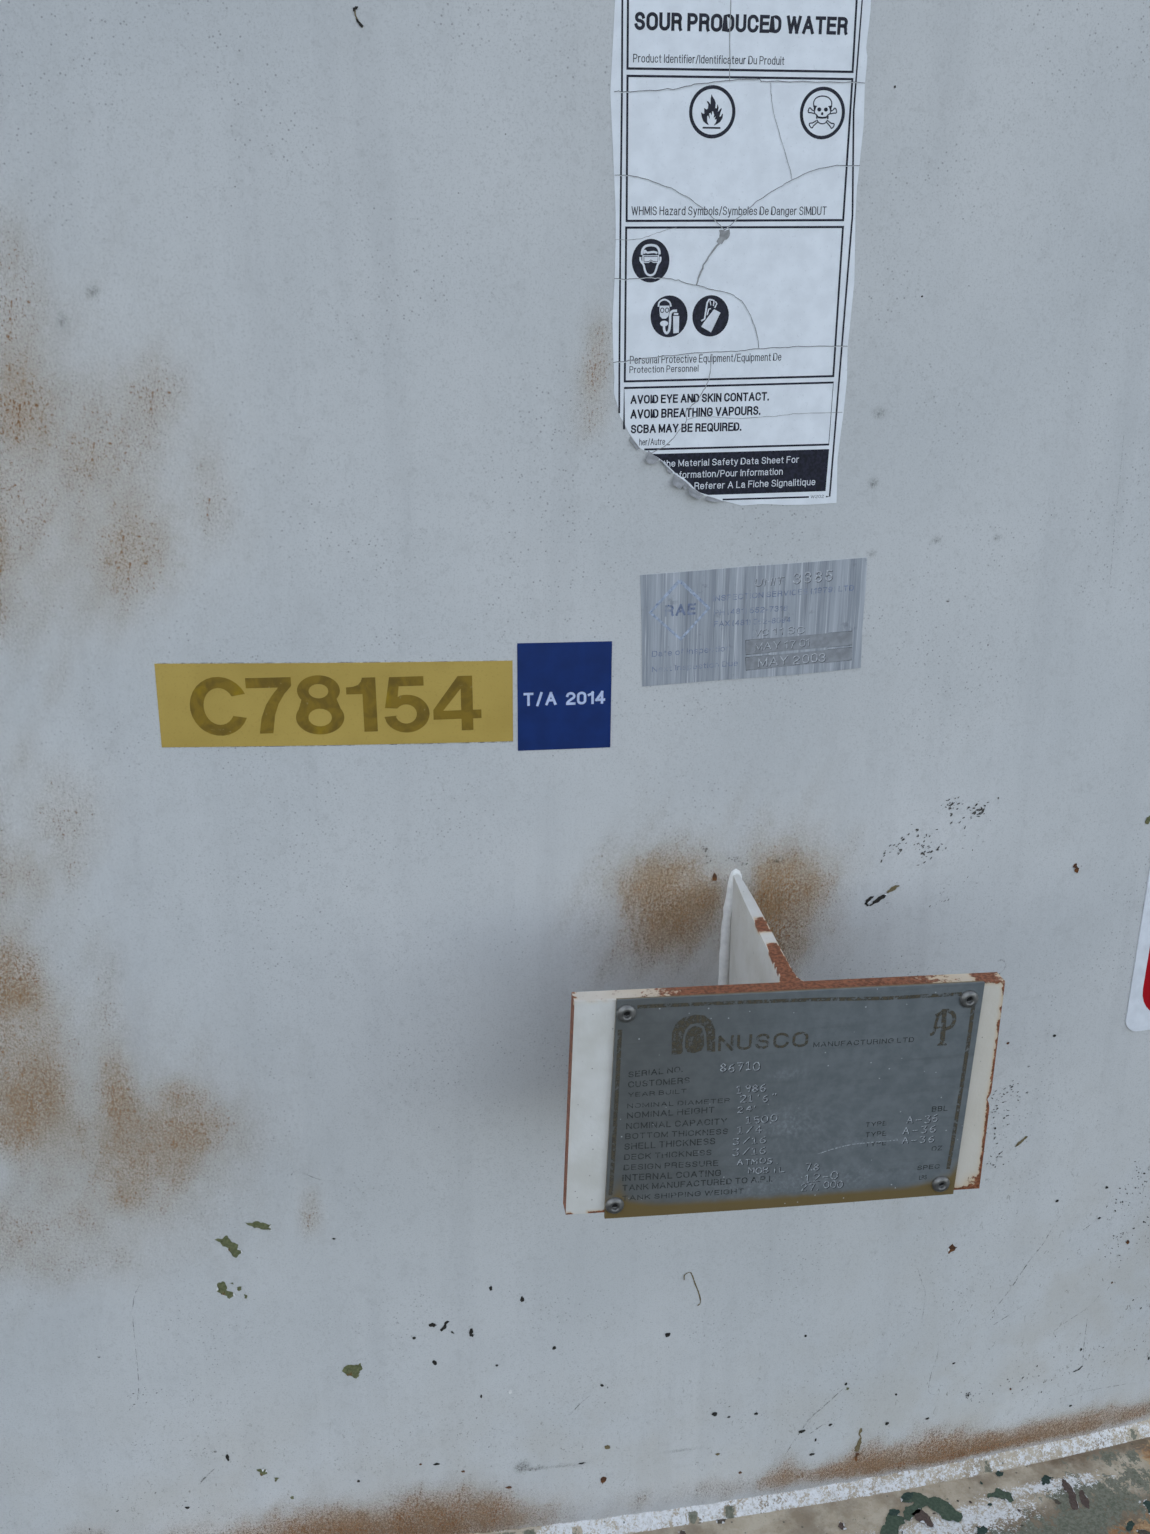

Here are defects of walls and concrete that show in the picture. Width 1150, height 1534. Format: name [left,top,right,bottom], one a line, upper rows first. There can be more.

corrosion [0,240,182,624]
corrosion [602,848,723,970]
corrosion [746,834,835,972]
corrosion [0,925,235,1218]
peeling [215,1235,243,1258]
peeling [245,1221,272,1231]
peeling [216,1281,247,1299]
corrosion [717,1403,1150,1490]
corrosion [221,1483,564,1534]
peeling [880,1471,1024,1534]
peeling [1040,1475,1090,1510]
peeling [1126,1499,1150,1534]